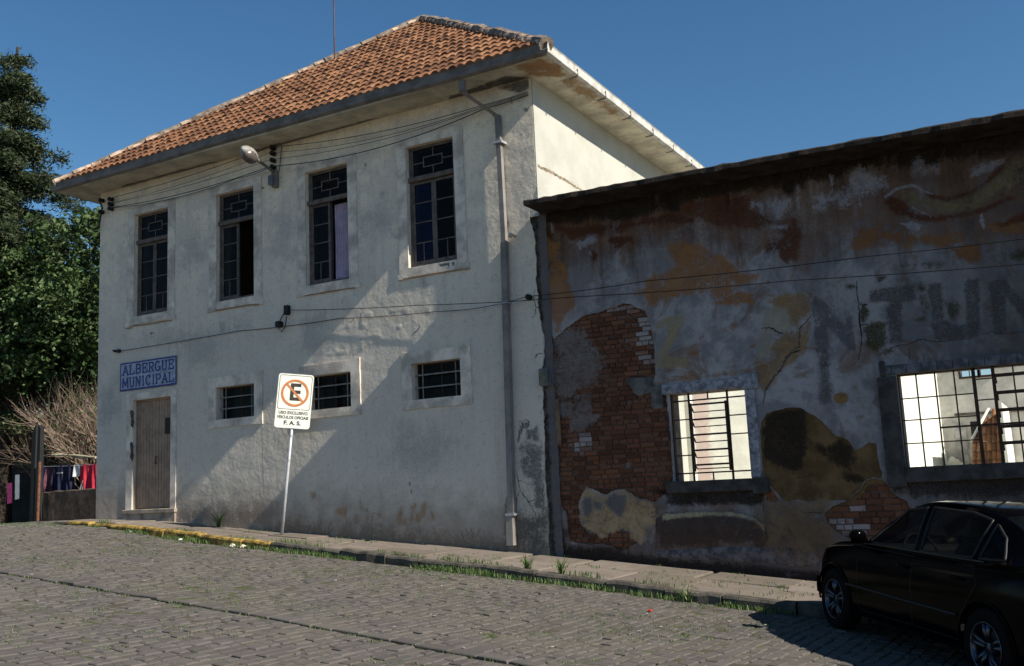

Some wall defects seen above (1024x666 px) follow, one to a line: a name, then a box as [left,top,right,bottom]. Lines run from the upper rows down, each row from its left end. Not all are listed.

damp [546,131,1024,287]
flaking render [530,213,673,557]
crack [761,315,811,404]
crack [856,281,1020,361]
damp [176,408,863,581]
flaking render [760,407,909,539]